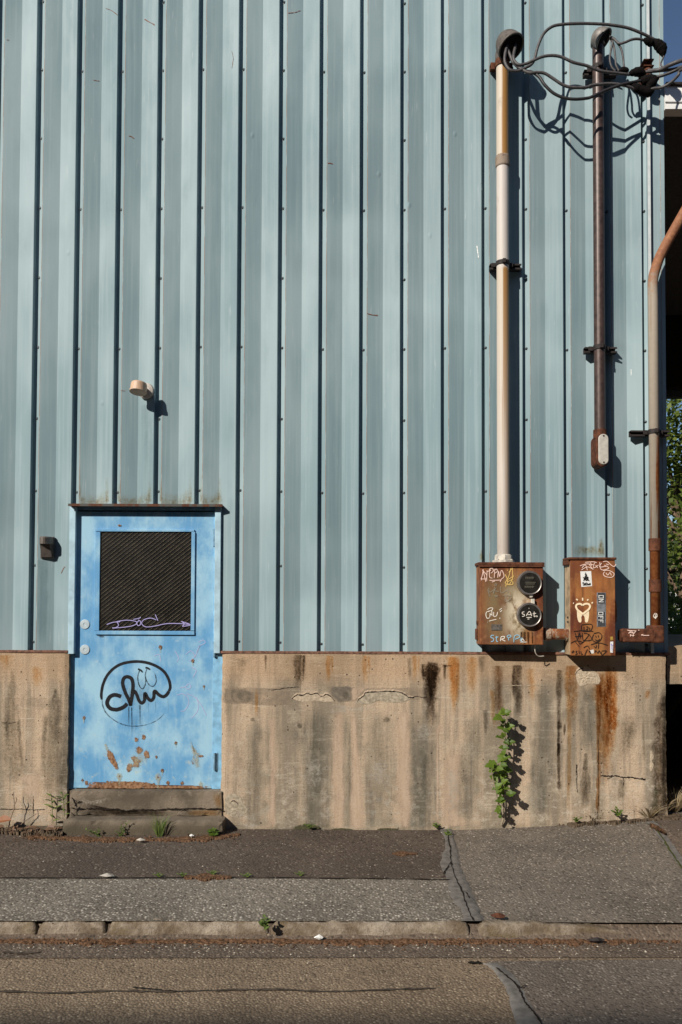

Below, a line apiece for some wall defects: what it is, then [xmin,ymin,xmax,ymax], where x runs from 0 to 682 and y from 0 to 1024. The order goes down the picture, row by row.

spalling [292,691,335,702]
spalling [357,689,414,705]
water stain [422,663,446,714]
corrosion [81,735,208,789]
crack [576,747,646,819]